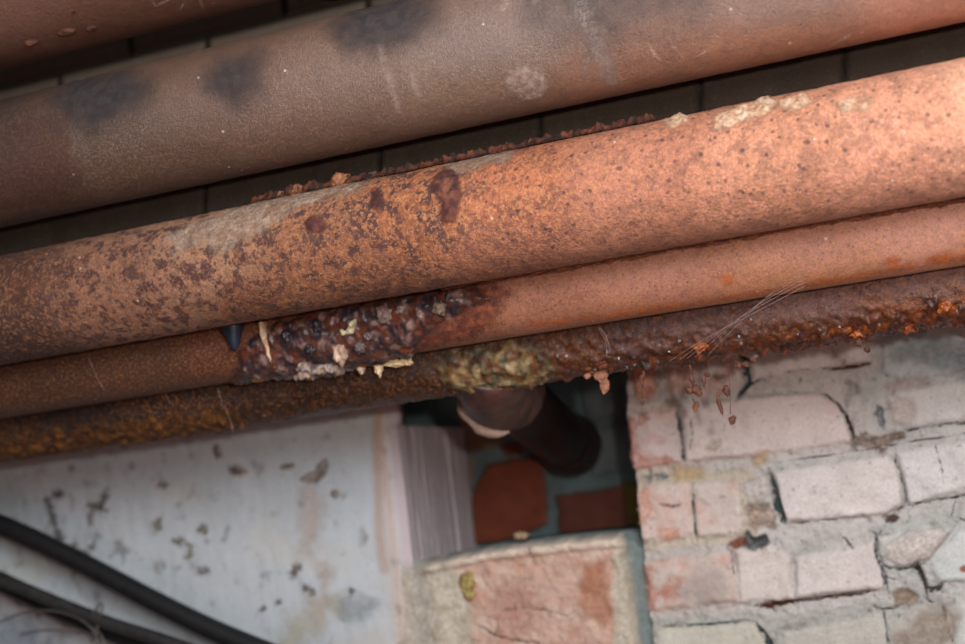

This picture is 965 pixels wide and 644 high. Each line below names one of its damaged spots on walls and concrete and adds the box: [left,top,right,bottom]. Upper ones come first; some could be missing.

corrosion [250,113,664,222]
efflorescence [169,183,360,253]
corrosion [305,216,326,233]
corrosion [443,198,965,290]
peeling [436,339,555,395]
corrosion [584,294,965,425]